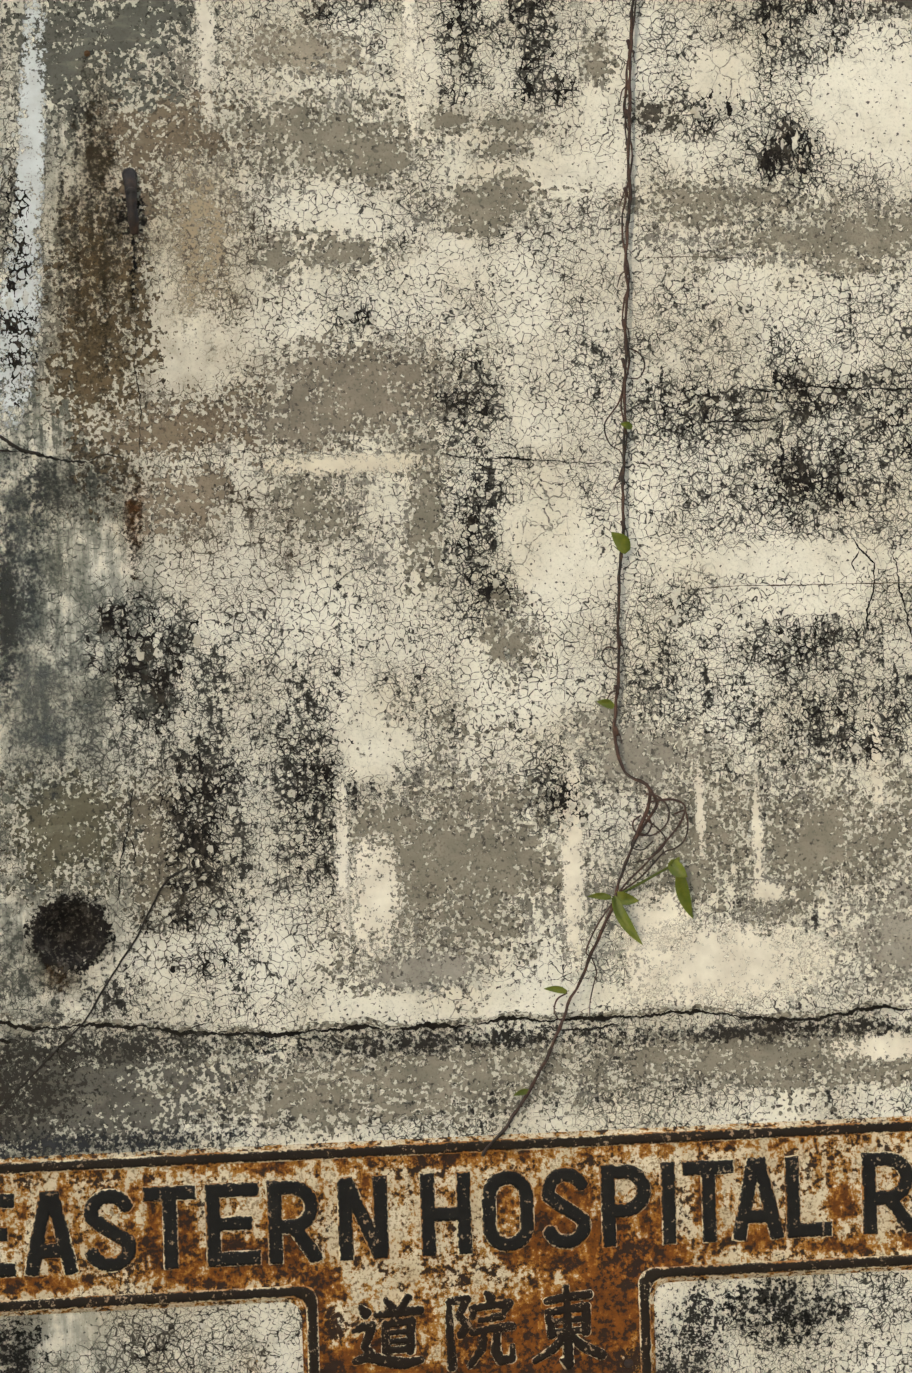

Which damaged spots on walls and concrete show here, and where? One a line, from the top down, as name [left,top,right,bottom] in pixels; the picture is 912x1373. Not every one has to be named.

peeling [0,0,912,696]
peeling [0,589,252,984]
peeling [0,680,912,1157]
crack [0,999,912,1068]